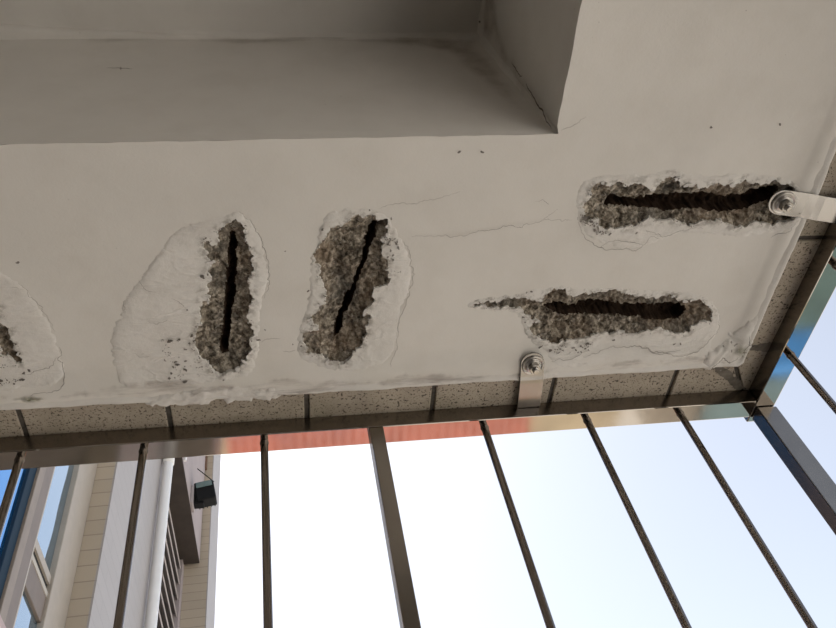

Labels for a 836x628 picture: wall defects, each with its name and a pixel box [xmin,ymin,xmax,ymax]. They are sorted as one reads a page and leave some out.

spalling [0,272,65,393]